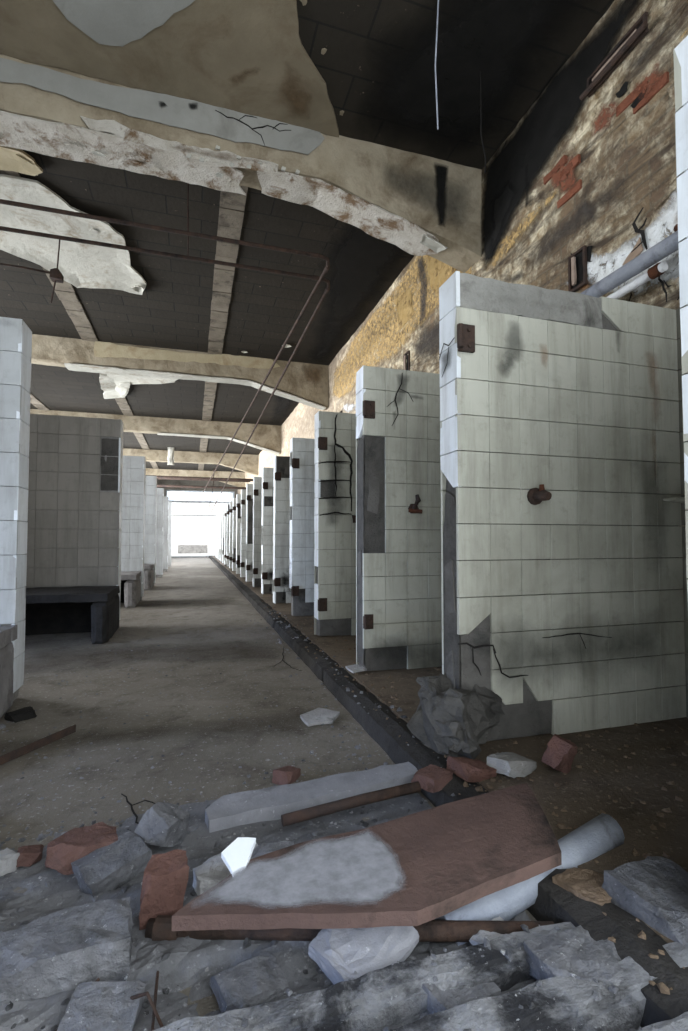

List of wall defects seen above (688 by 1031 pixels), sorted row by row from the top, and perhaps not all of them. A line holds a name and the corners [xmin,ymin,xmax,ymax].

crack [215,110,291,145]
flaking render [593,63,669,135]
peeling [0,0,603,398]
peeling [64,341,326,410]
crack [387,373,413,425]
crack [318,414,353,516]
peeling [357,436,385,666]